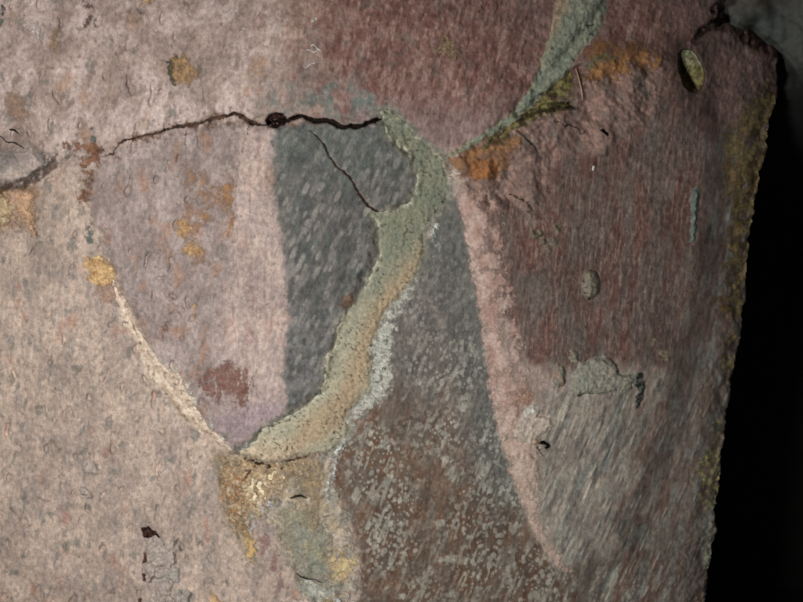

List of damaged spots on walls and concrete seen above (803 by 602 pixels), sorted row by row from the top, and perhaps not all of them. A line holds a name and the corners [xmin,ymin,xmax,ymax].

crack [105,107,381,212]
peeling [552,349,645,408]
peeling [138,526,194,602]